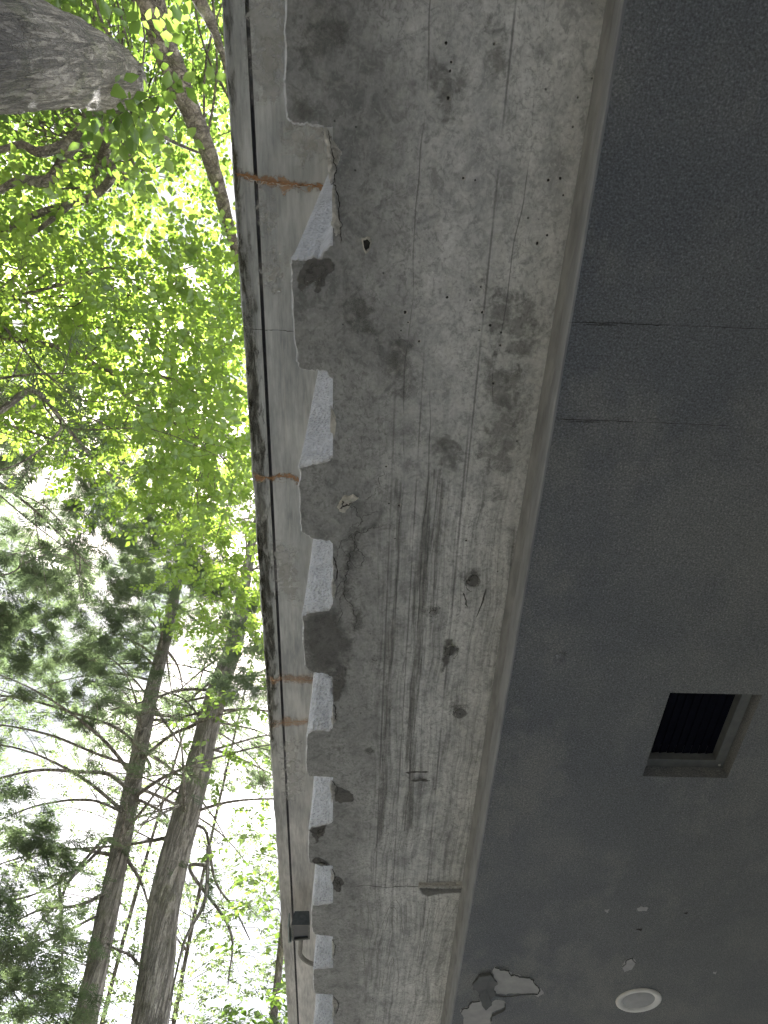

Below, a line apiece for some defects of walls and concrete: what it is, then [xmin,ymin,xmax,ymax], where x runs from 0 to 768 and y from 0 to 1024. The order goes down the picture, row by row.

crack [335,471,387,628]
peeling [460,967,544,1024]